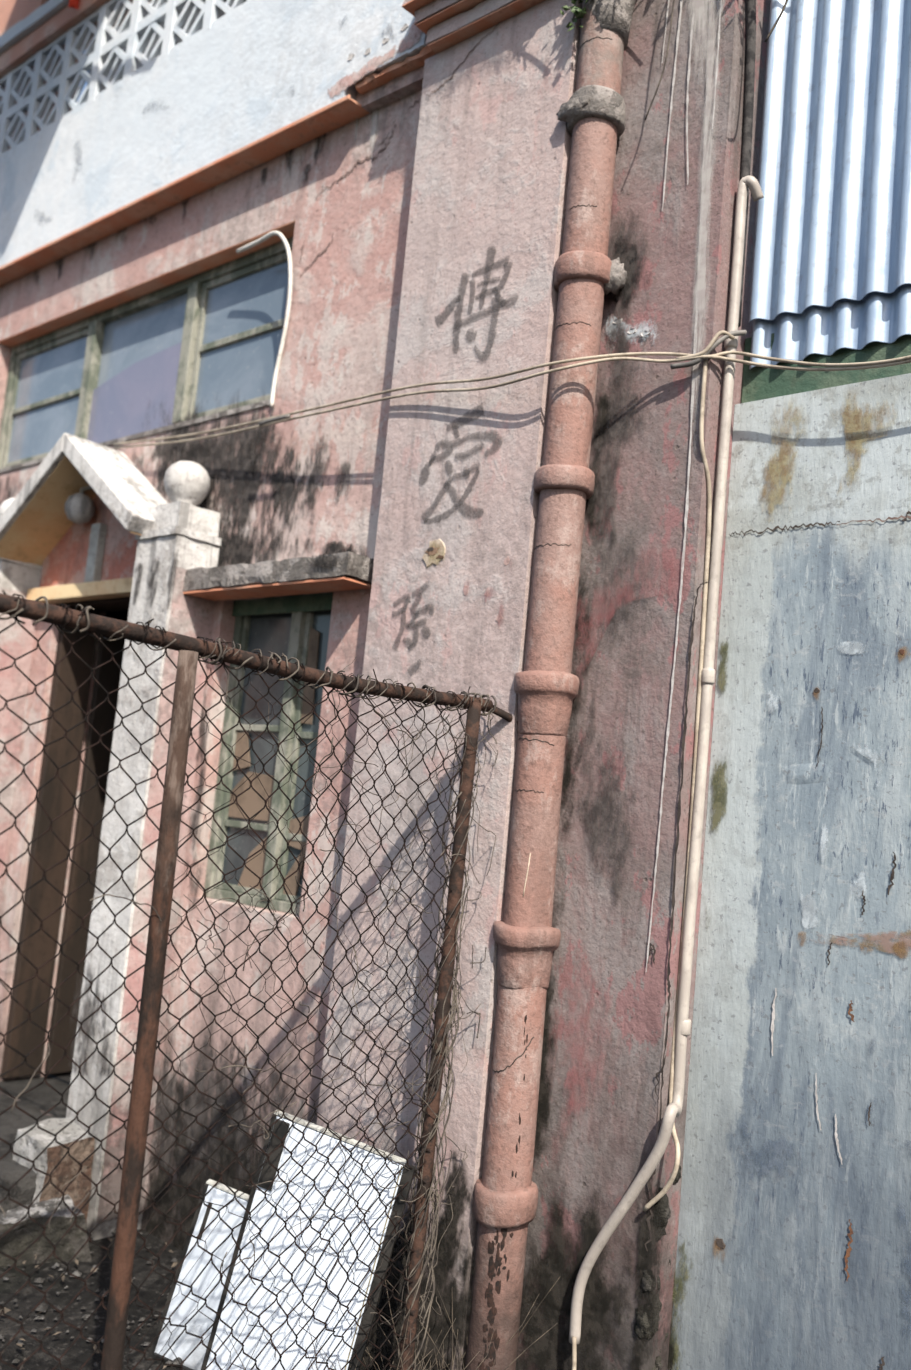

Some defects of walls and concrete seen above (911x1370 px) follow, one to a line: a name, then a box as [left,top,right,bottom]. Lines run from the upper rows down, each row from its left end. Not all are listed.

peeling [328,23,422,97]
crack [315,21,501,198]
crack [299,233,334,277]
water stain [133,401,350,566]
rust [830,931,911,958]
water stain [533,981,555,1163]
water stain [517,1195,643,1370]